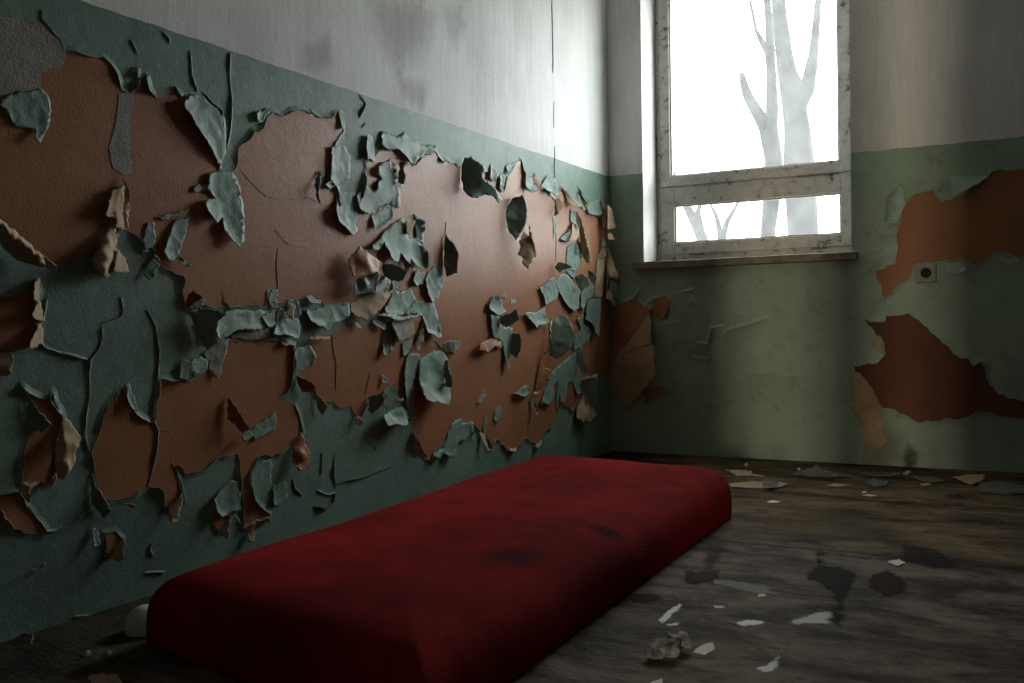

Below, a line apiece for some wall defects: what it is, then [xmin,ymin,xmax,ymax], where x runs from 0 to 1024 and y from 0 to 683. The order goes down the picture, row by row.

peeling [0,15,672,562]
peeling [843,165,1024,451]